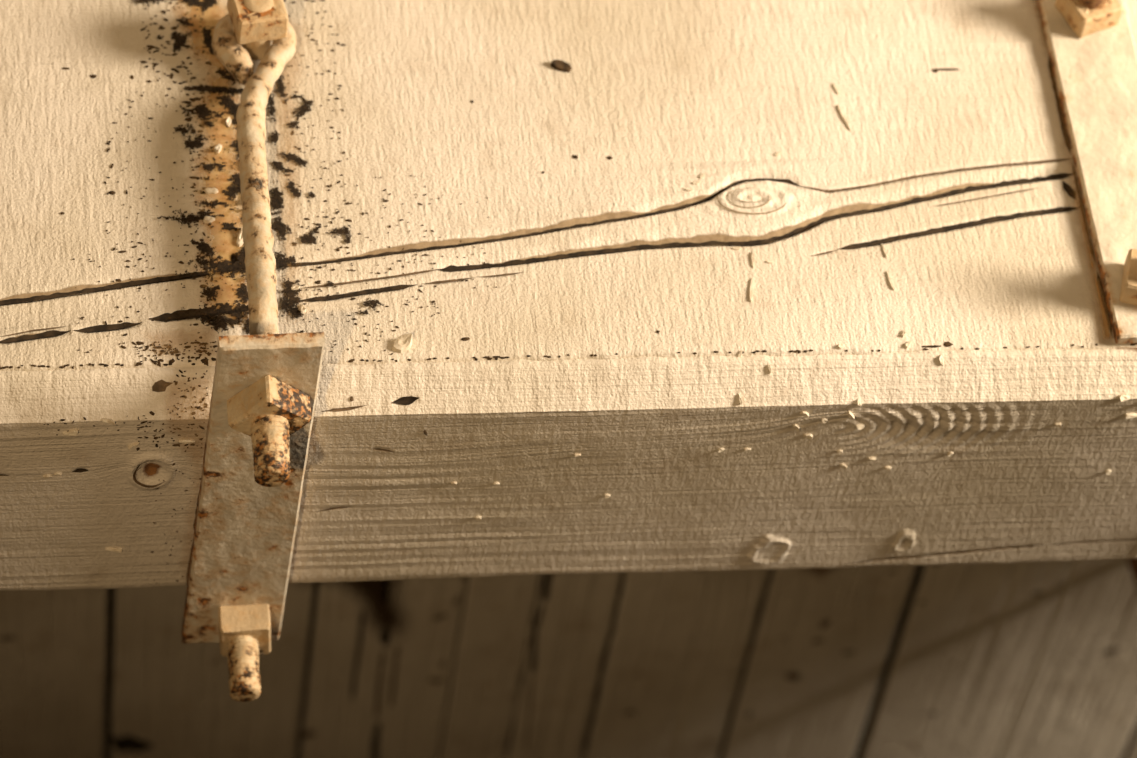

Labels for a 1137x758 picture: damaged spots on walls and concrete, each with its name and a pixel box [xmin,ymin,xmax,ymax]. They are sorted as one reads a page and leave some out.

crack [0,270,213,306]
crack [0,307,244,343]
rust [182,0,245,309]
crack [280,0,1112,335]